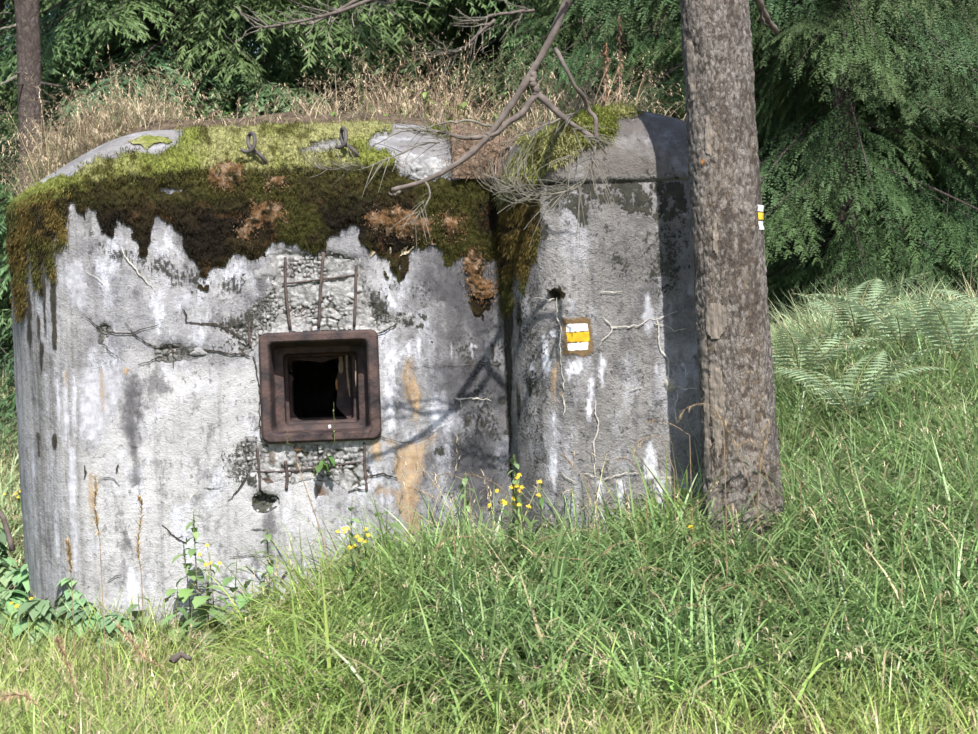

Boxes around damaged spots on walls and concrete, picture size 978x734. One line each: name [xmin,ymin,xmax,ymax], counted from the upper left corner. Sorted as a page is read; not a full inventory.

spalling [216,249,415,355]
water stain [27,258,139,571]
crack [86,307,262,441]
corrosion [404,358,421,415]
water stain [565,355,606,418]
spalling [222,436,372,512]
corrosion [372,434,437,534]